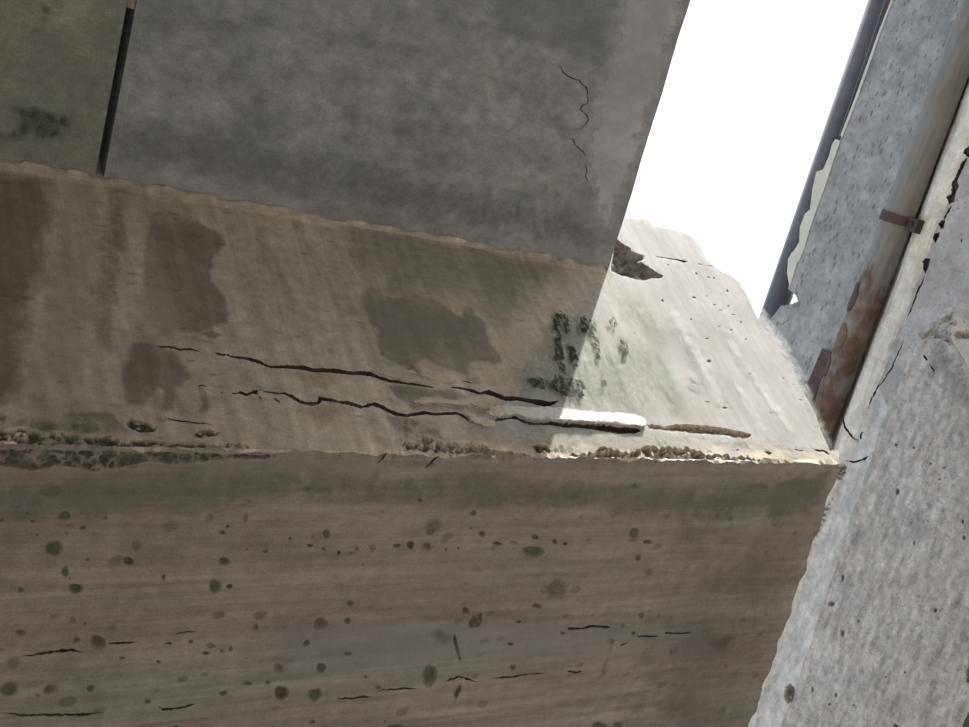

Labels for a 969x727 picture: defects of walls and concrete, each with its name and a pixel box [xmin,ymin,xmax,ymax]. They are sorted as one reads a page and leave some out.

crack [555,64,589,181]
peeling [787,0,894,287]
spalling [611,240,663,281]
damp [477,0,824,453]
crack [868,146,969,408]
spalling [917,303,969,345]
crack [157,345,640,434]
spalling [0,418,301,472]
crack [795,416,868,463]